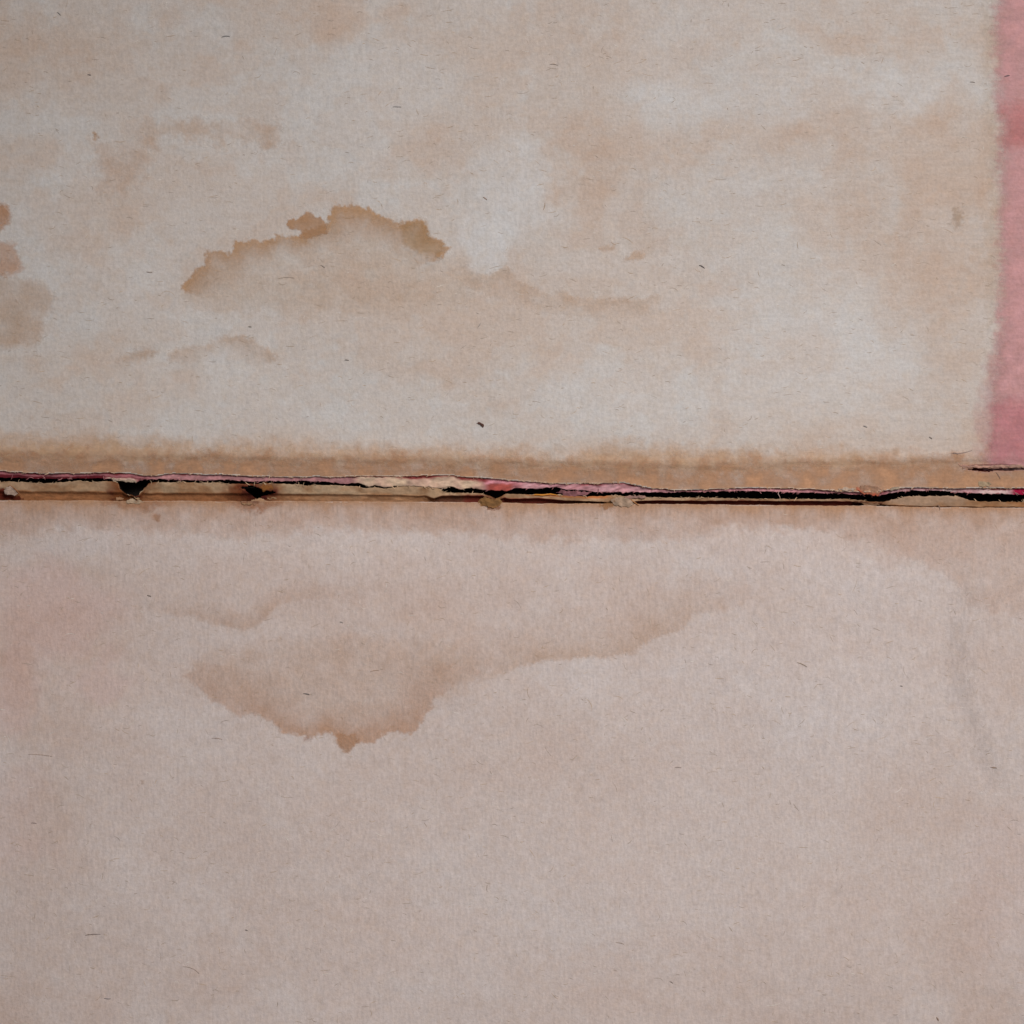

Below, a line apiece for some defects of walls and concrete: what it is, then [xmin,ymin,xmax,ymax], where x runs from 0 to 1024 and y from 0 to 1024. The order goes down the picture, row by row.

leakage [287,206,449,257]
leakage [989,0,1024,466]
crack [0,464,1024,504]